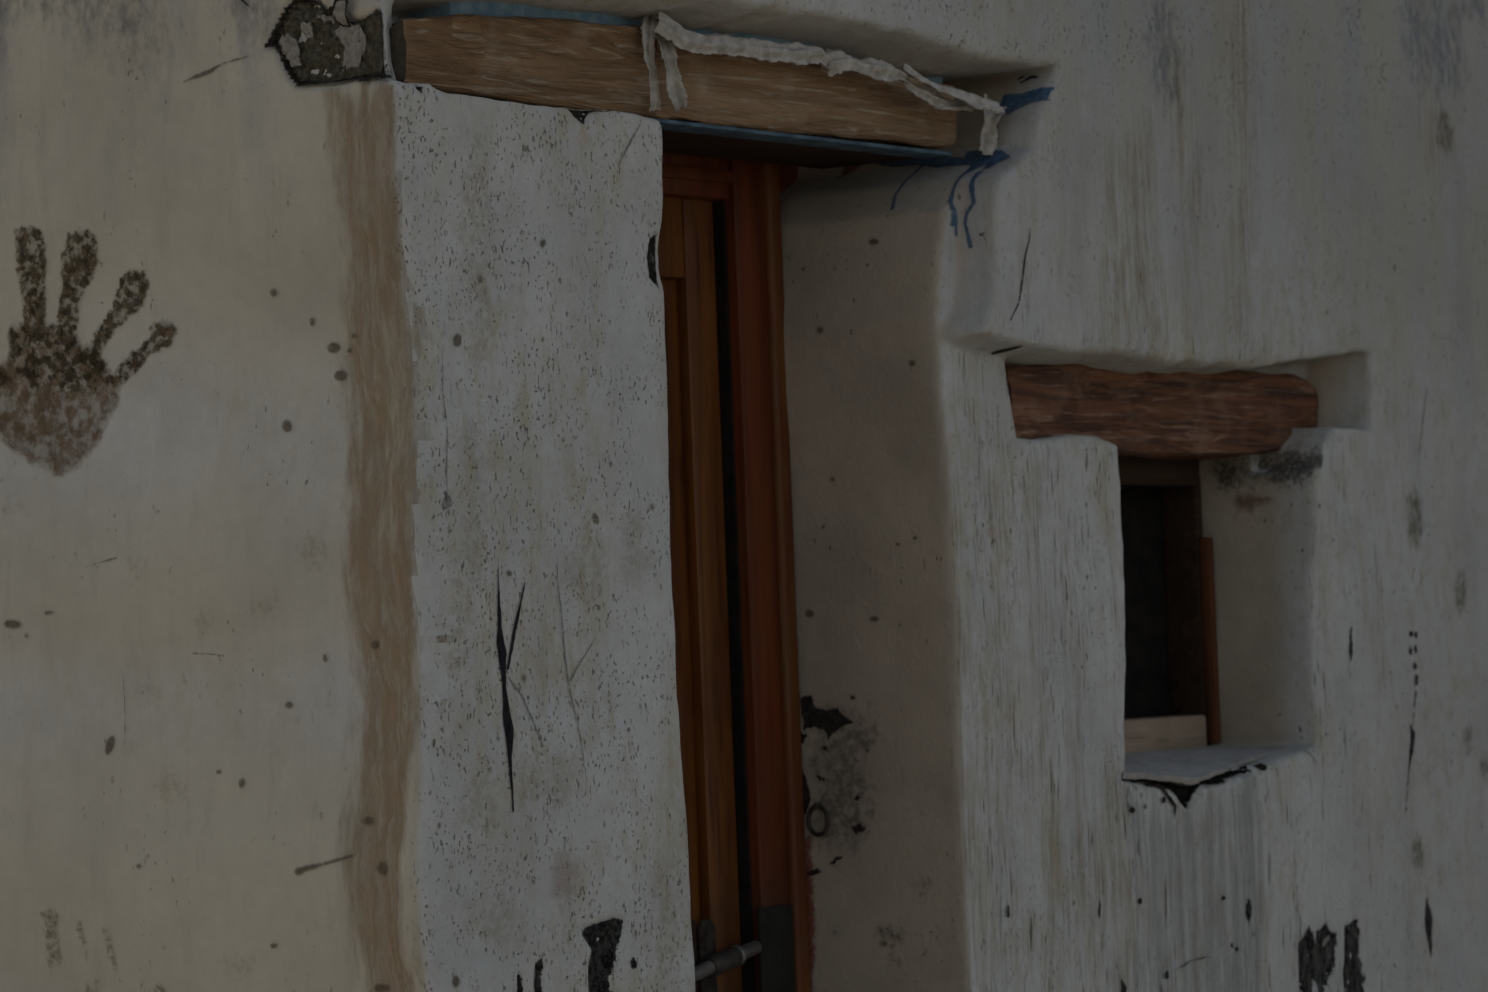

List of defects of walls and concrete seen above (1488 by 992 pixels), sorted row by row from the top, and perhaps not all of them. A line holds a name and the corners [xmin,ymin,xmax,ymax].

flaking render [265,0,393,86]
flaking render [517,958,543,992]
flaking render [583,918,638,992]
flaking render [1298,919,1366,992]
flaking render [1425,898,1433,957]